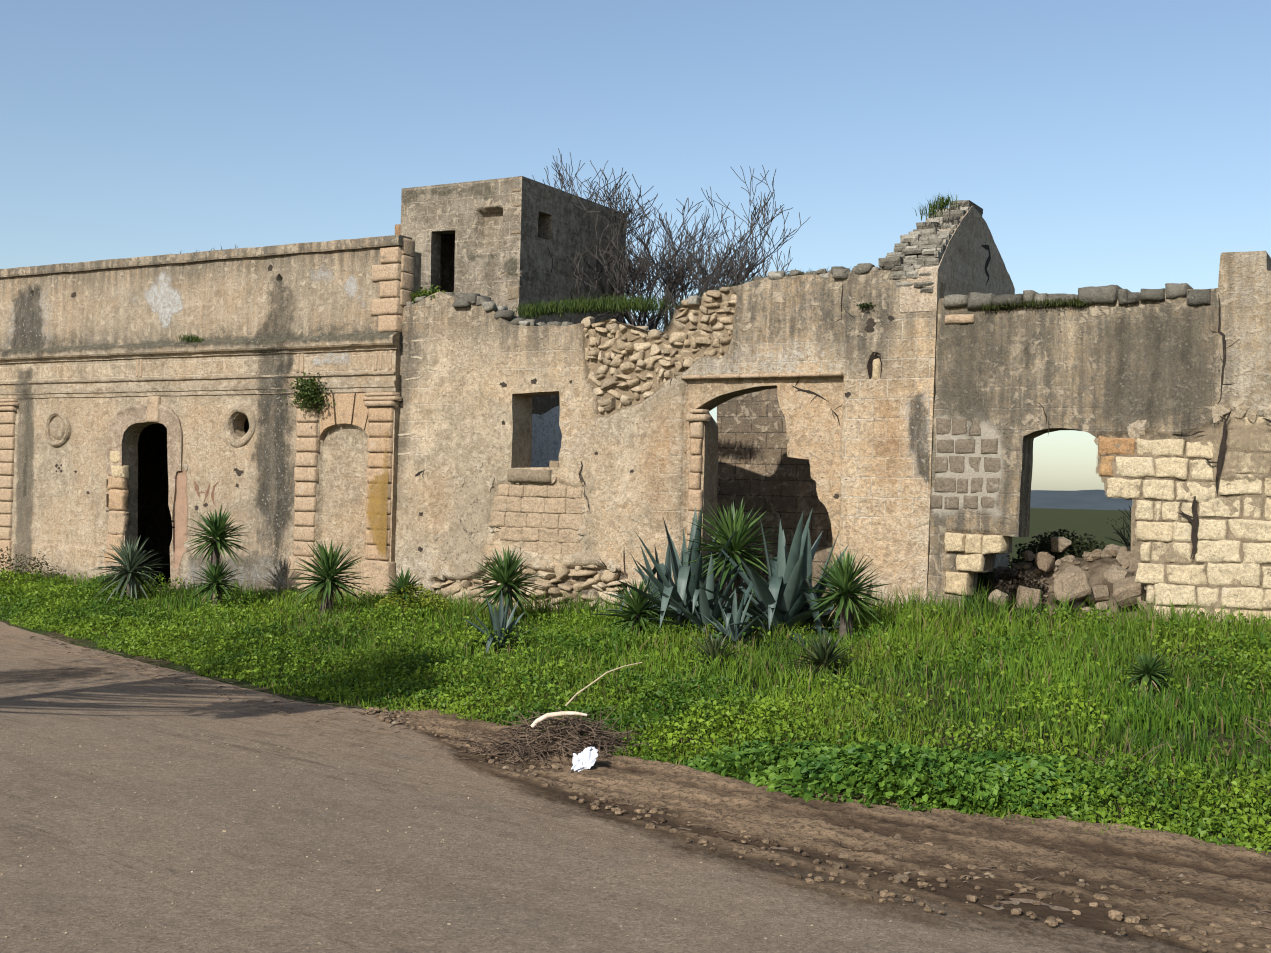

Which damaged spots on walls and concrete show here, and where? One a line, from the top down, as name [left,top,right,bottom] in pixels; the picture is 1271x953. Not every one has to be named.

leakage [2,285,62,359]
leakage [14,371,34,572]
leakage [190,278,295,591]
peeling [930,411,1003,519]
spalling [944,532,1009,596]
peeling [1094,397,1271,636]
crack [1172,294,1239,559]